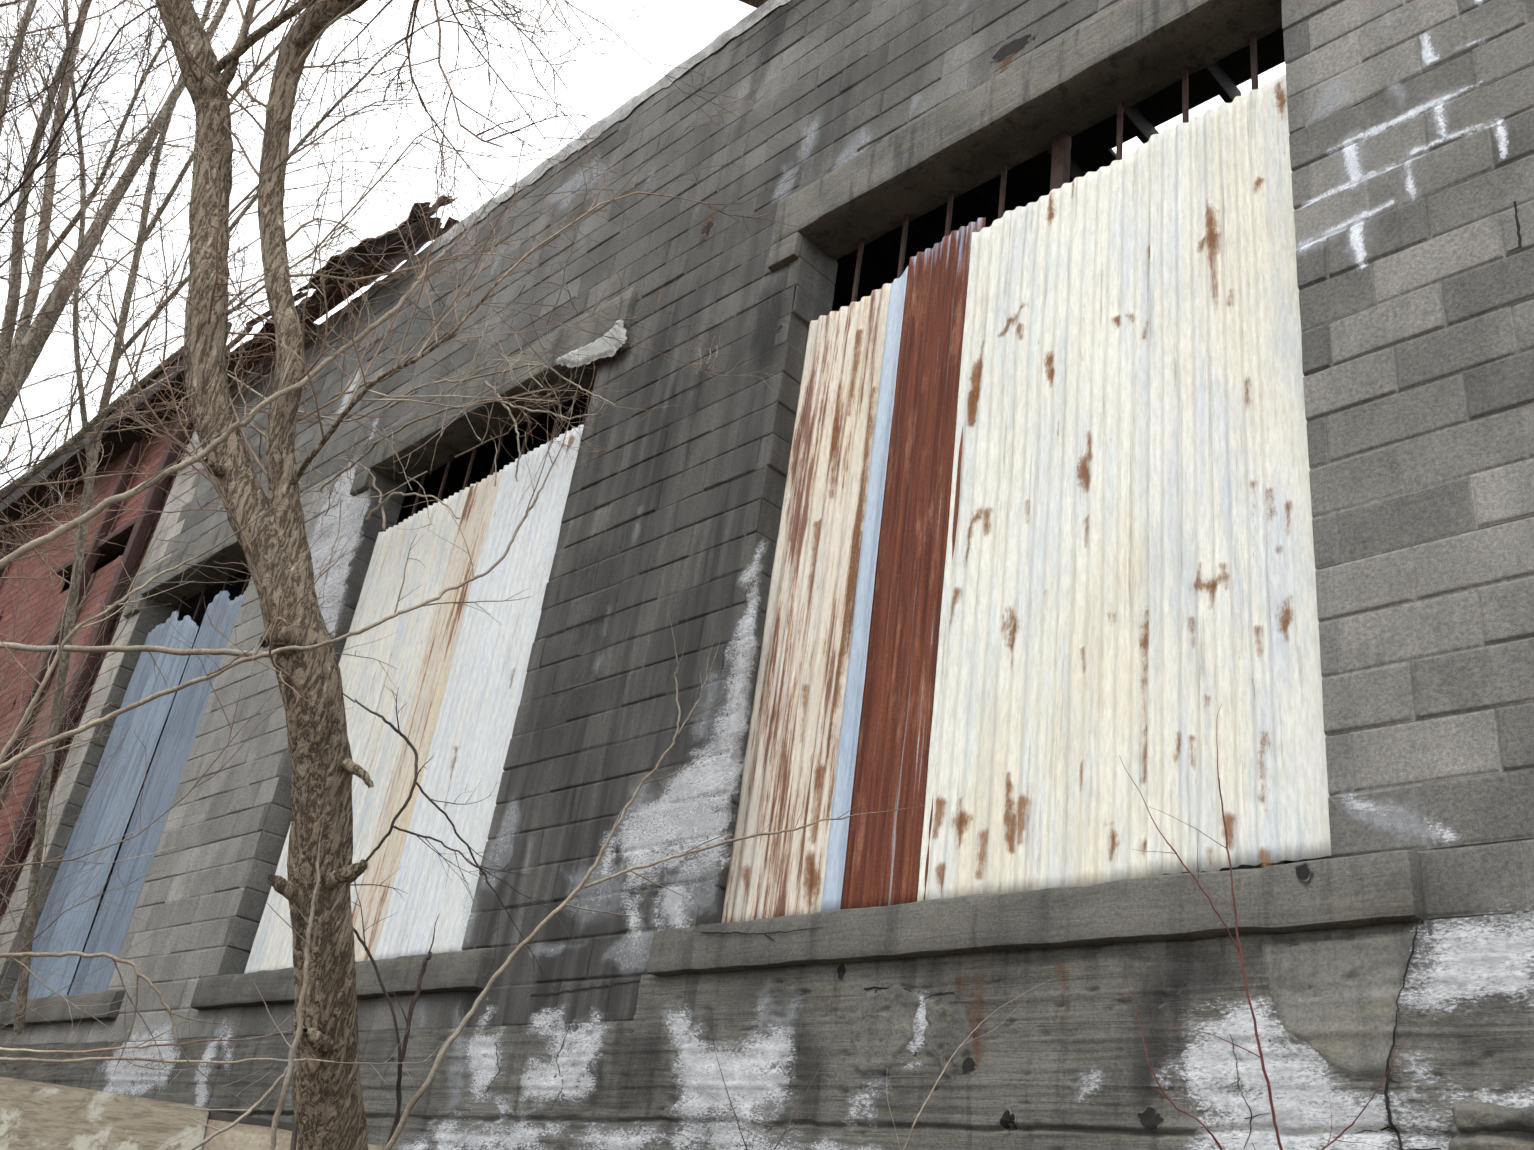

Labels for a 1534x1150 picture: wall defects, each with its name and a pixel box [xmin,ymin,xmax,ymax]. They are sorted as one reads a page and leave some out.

rust [1200,207,1231,305]
rust [967,342,984,425]
rust [827,387,875,745]
efflorescence [598,542,765,955]
rust [803,766,825,906]
rust [934,798,987,878]
rust [1004,773,1027,853]
efflorescence [397,1003,881,1150]
efflorescence [904,991,929,1070]
damp [1156,999,1534,1150]
crack [1356,928,1441,1150]
efflorescence [1397,912,1534,1014]